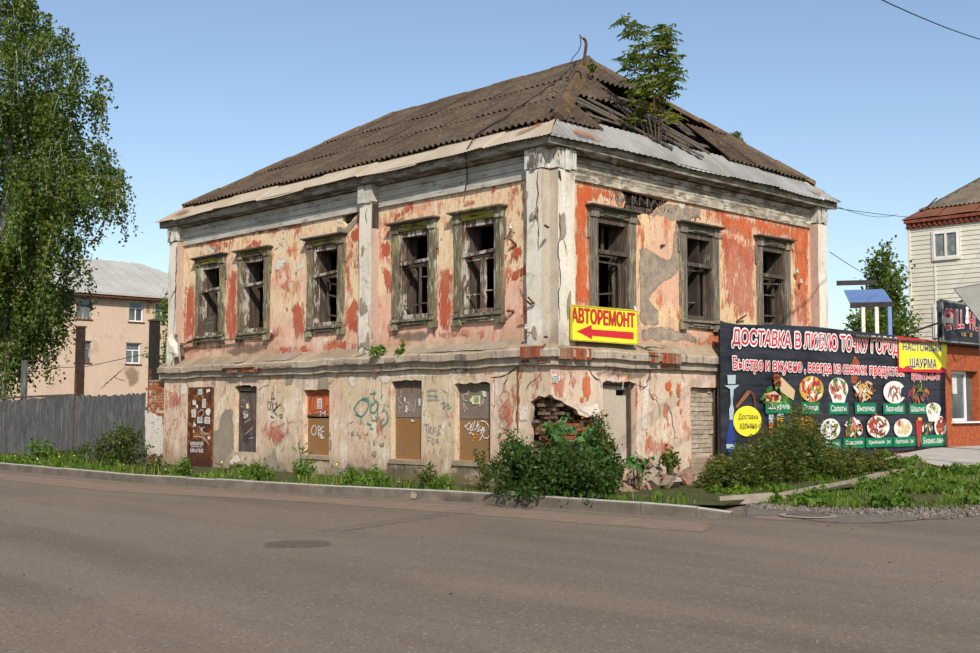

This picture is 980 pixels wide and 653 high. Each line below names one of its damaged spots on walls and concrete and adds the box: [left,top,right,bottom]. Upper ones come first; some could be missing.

peeling [174,225,298,364]
peeling [208,212,377,390]
peeling [382,268,392,292]
peeling [437,269,468,338]
peeling [504,241,527,285]
flaking render [638,200,810,455]
flaking render [146,379,183,463]
peeling [351,416,386,457]
spalling [500,326,597,455]